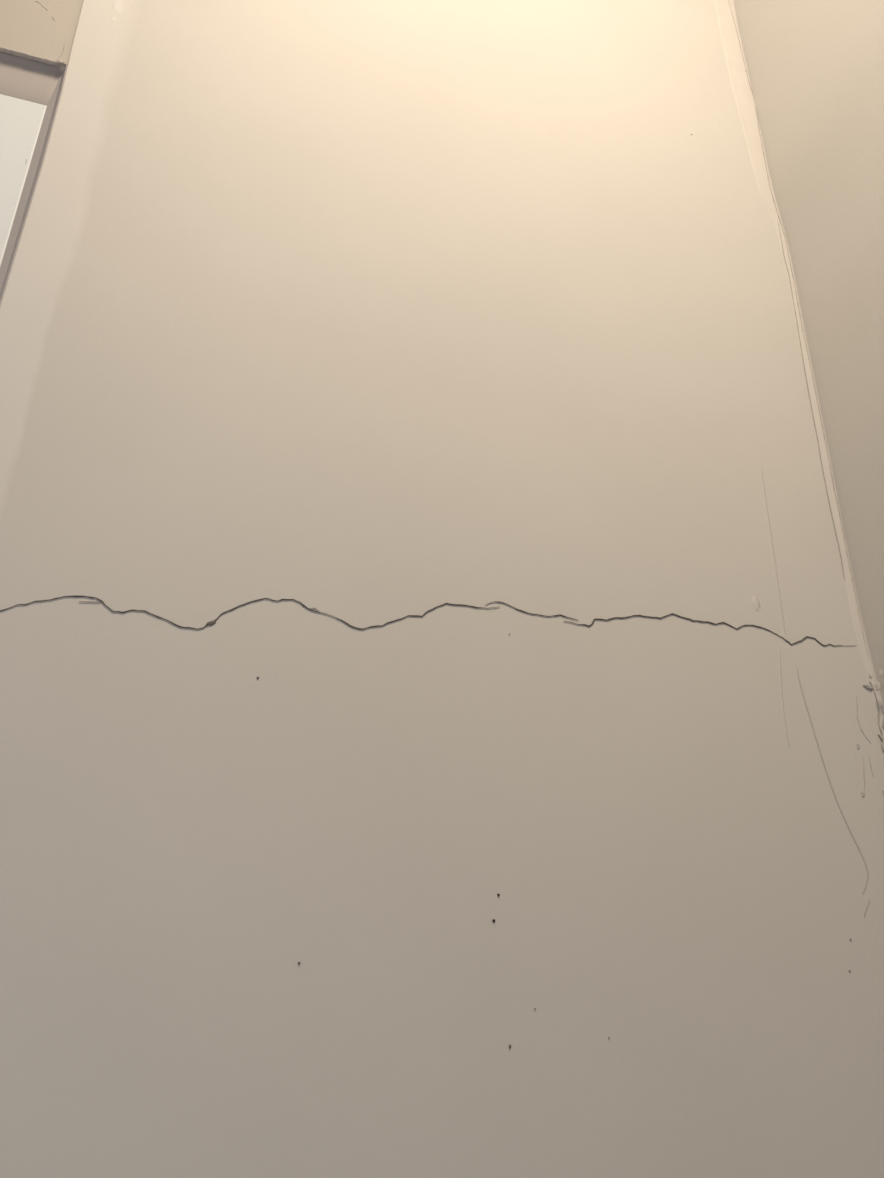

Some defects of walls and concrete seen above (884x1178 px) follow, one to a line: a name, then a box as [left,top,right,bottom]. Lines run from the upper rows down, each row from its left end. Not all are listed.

crack [0,0,874,917]